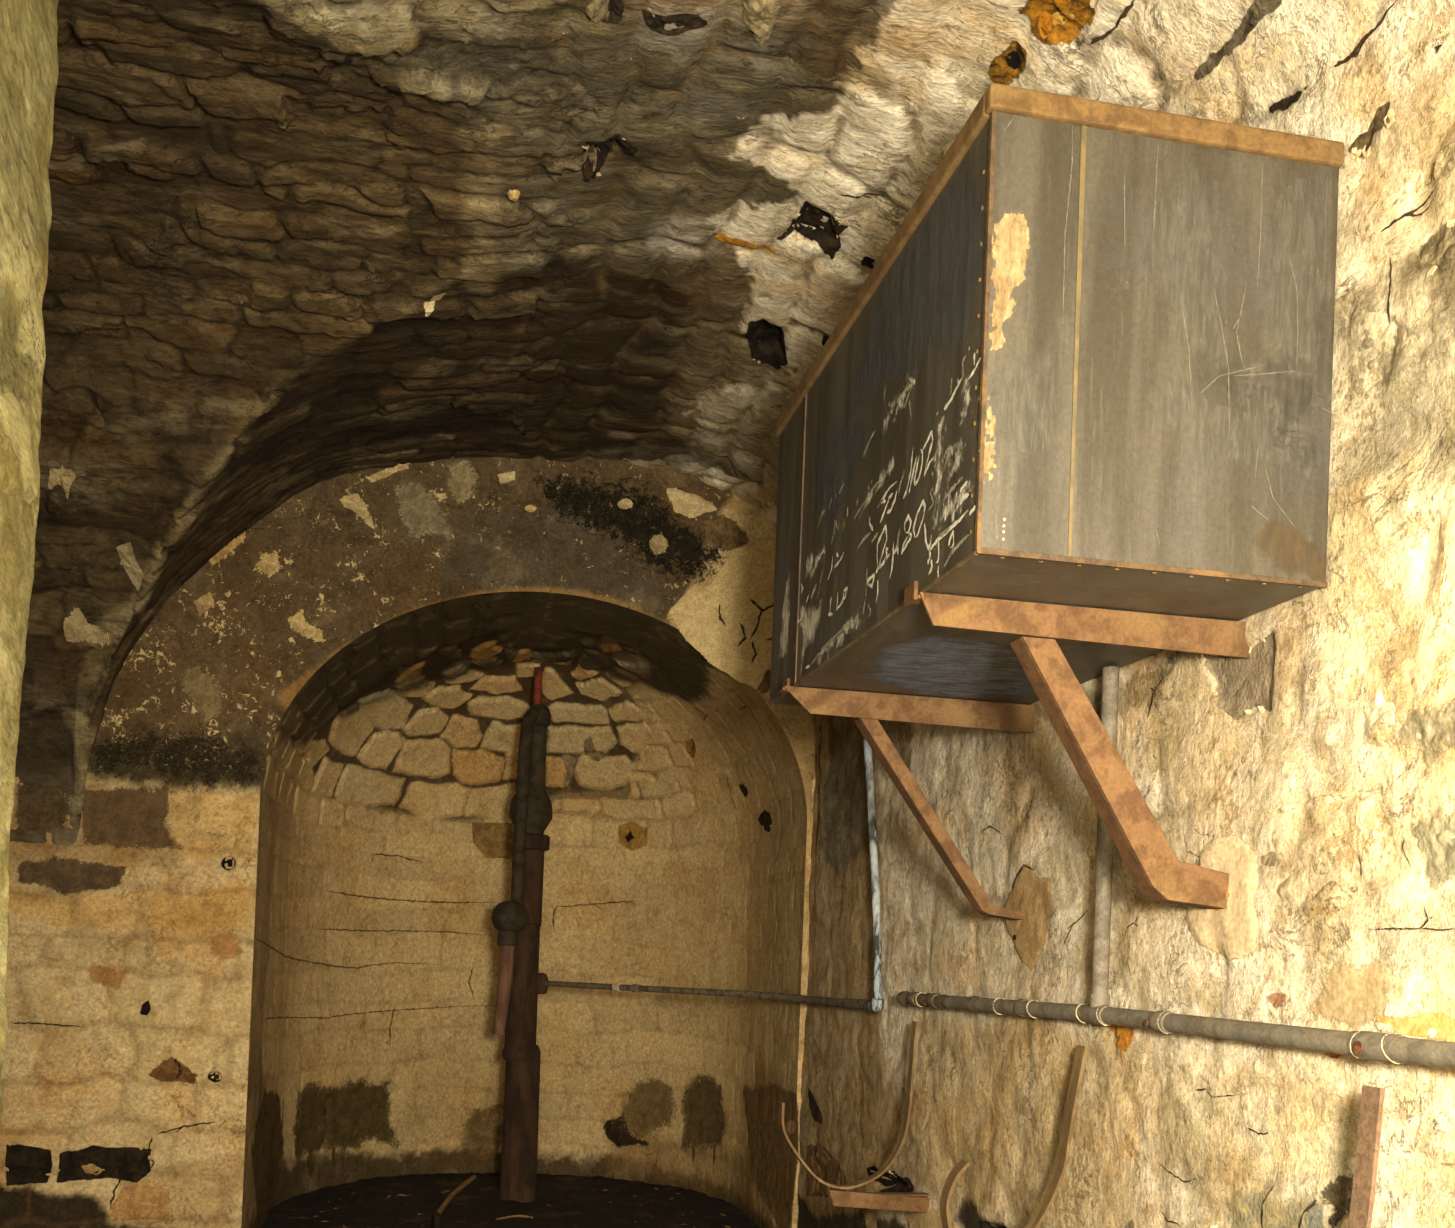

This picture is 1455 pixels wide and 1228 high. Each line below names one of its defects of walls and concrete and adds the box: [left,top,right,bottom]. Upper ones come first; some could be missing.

spalling [642,10,708,36]
crack [1334,0,1397,67]
spalling [581,135,638,182]
spalling [777,201,848,259]
spalling [744,319,788,370]
leakage [524,470,726,583]
crack [693,599,773,738]
leakage [15,726,267,895]
leakage [251,1078,399,1222]
leakage [603,1075,727,1164]
leakage [742,1081,799,1228]
spalling [1321,1174,1354,1228]